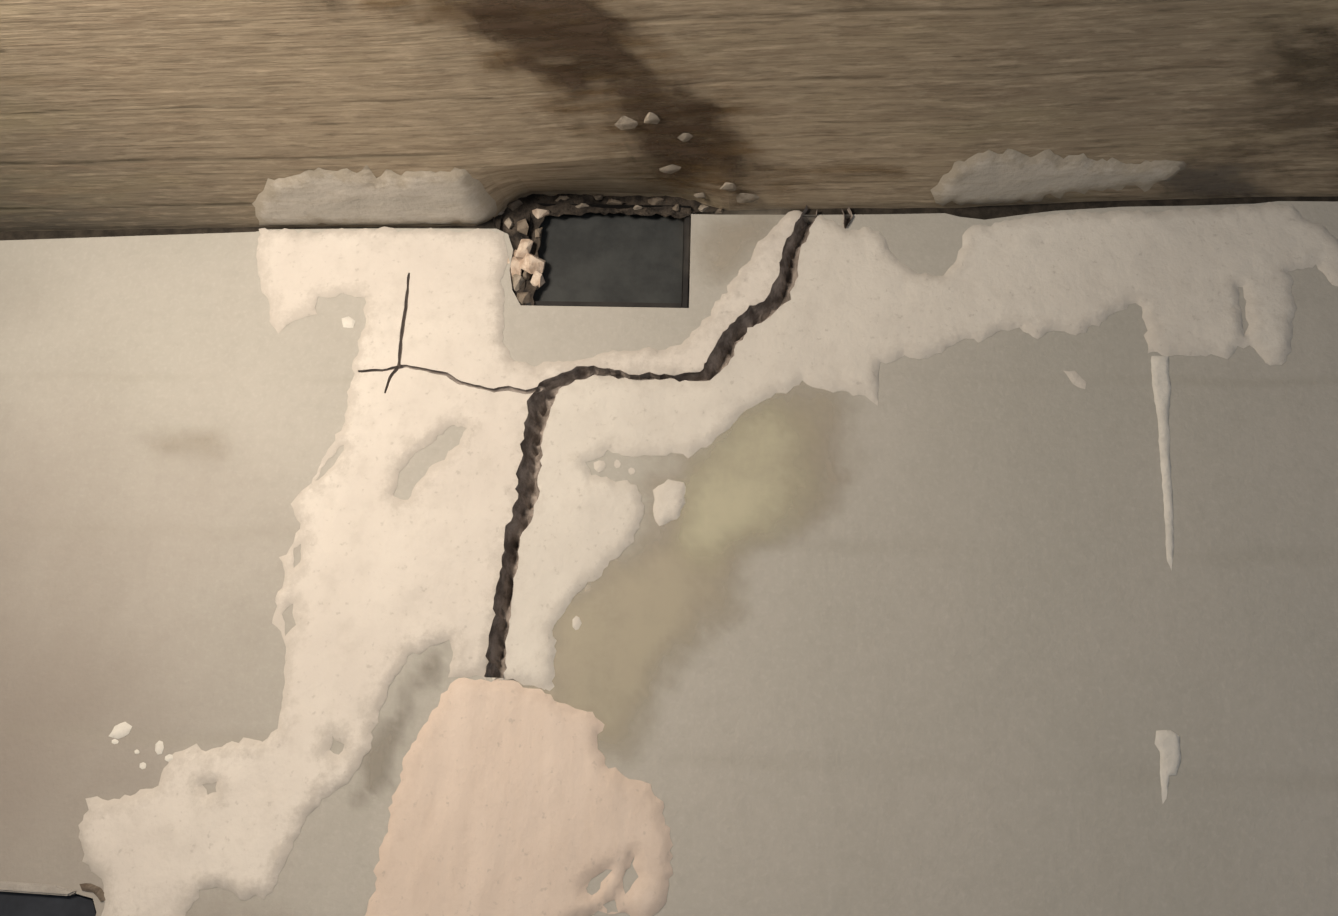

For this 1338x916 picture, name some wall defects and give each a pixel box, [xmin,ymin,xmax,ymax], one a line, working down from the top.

spalling [493,194,723,306]
damp [532,395,833,743]
crack [358,196,1338,678]